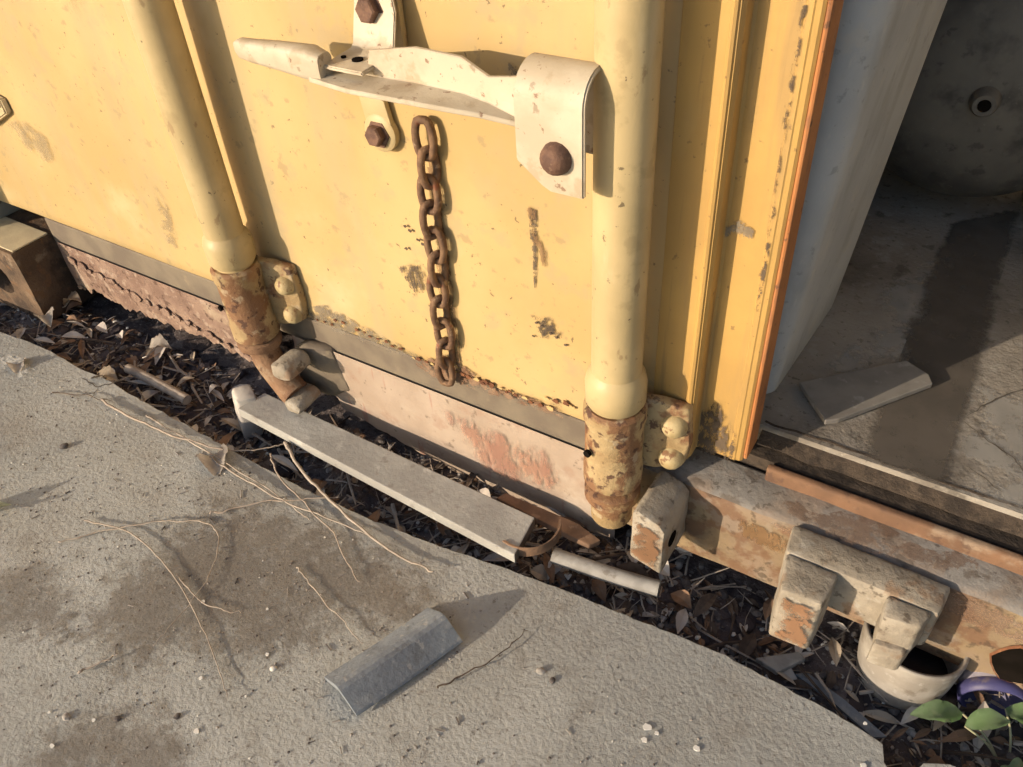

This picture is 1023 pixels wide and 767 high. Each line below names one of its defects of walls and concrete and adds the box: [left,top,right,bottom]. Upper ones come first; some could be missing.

rust [57,242,253,362]
damp [867,211,1019,481]
rust [738,520,786,553]
rust [775,598,814,648]
rust [989,645,1023,685]